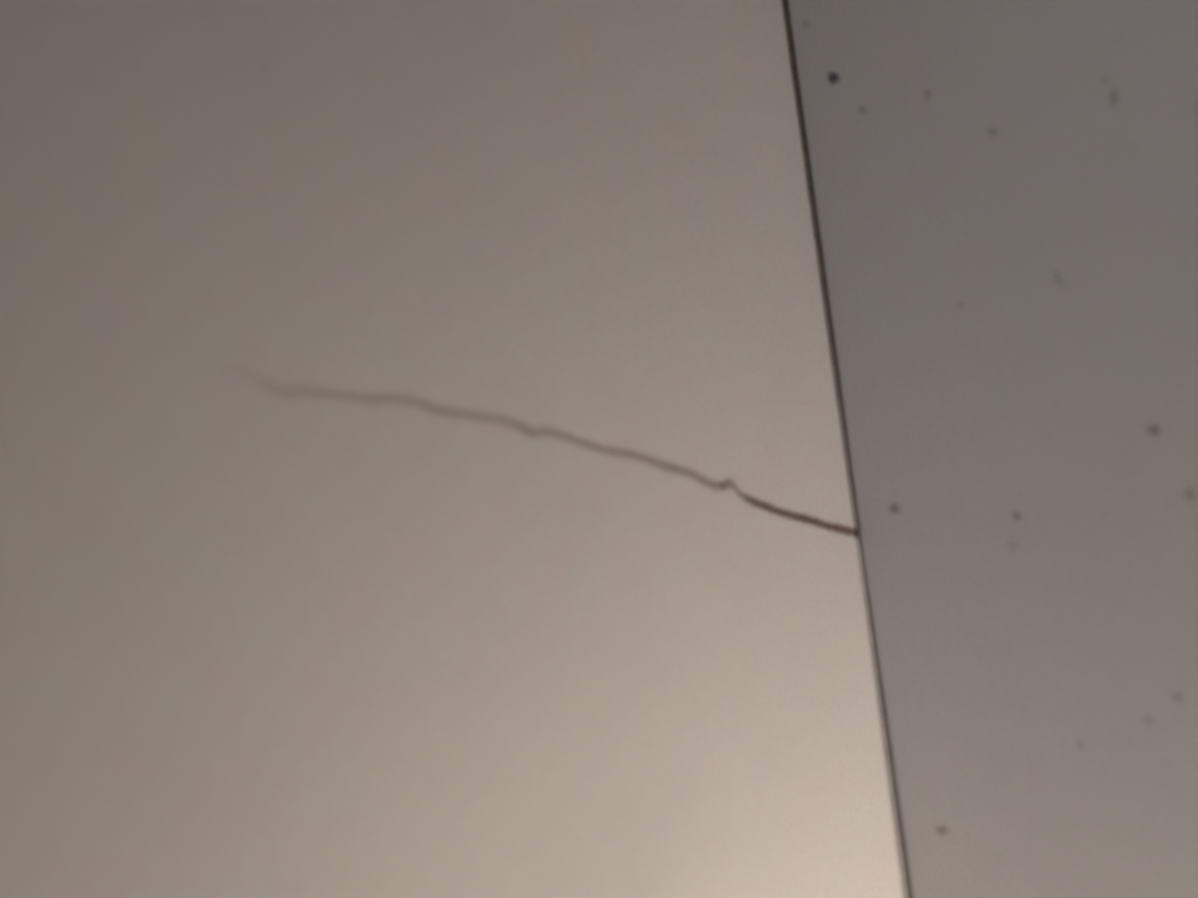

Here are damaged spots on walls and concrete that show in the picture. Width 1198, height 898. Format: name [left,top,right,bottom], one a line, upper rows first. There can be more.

crack [748,499,858,535]